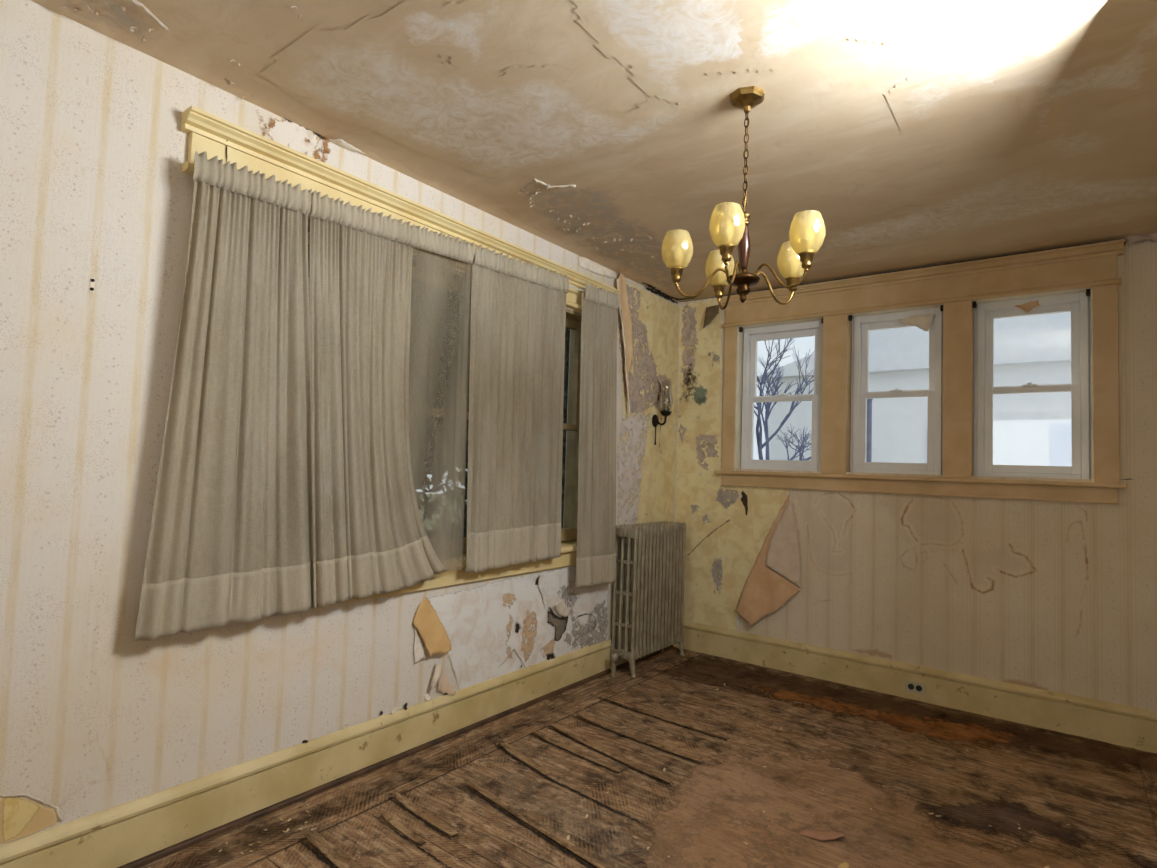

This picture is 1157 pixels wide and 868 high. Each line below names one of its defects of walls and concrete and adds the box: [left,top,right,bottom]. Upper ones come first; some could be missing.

peeling [31,0,189,56]
leakage [306,138,330,162]
peeling [261,0,1030,526]
flaking render [711,557,723,595]
peeling [734,495,802,627]
peeling [414,596,456,701]
flaking render [547,581,613,661]